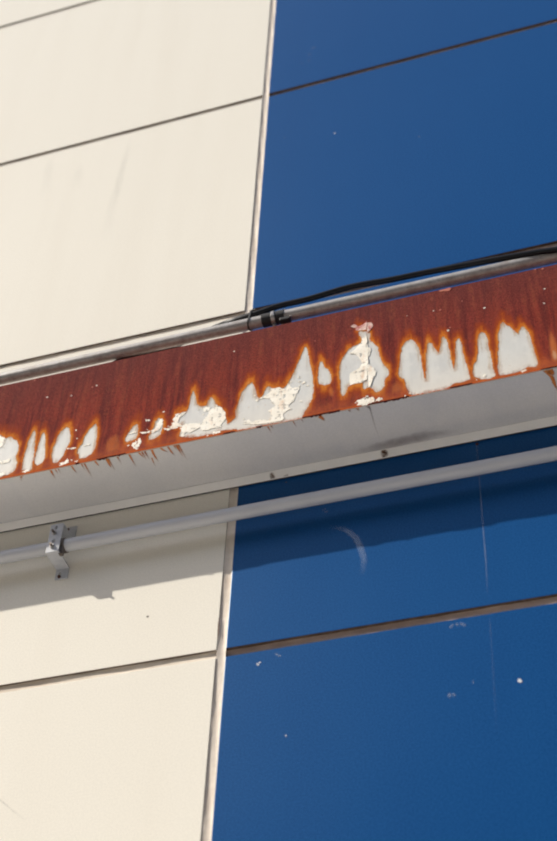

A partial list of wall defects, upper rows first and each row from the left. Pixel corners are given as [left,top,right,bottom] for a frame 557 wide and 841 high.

peeling [127,405,226,449]
peeling [243,376,309,425]
rust [0,264,557,479]
peeling [349,321,383,406]